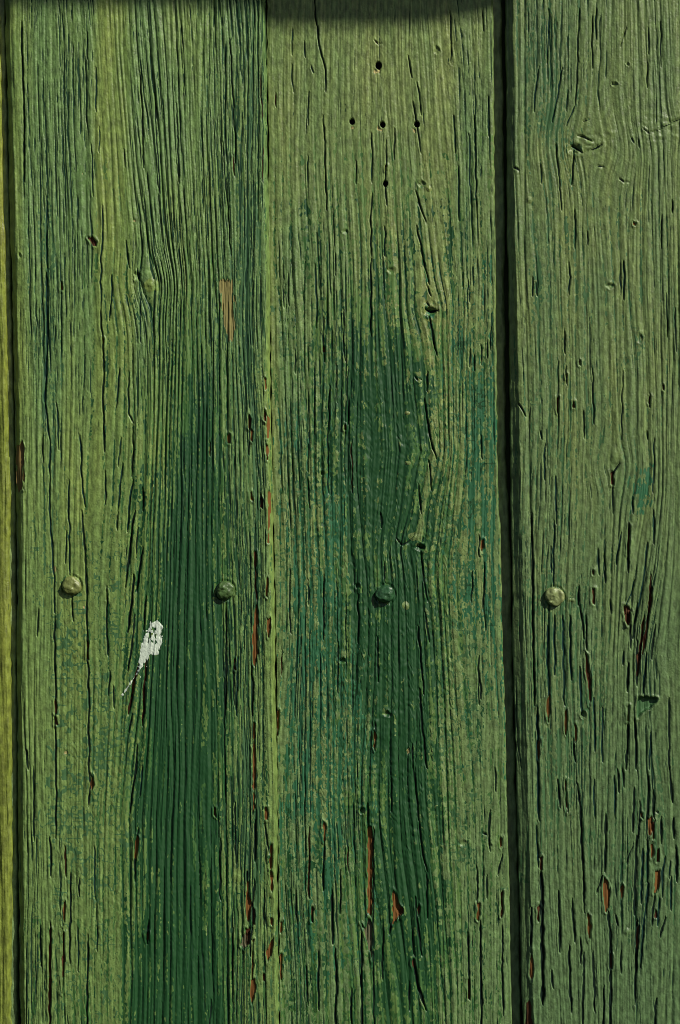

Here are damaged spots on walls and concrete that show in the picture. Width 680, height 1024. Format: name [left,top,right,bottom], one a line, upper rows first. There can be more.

peeling [219,279,236,342]
crack [8,0,410,1024]
crack [394,0,680,1024]
peeling [252,605,271,666]
peeling [624,588,652,638]
peeling [641,813,660,893]
peeling [362,826,373,957]
peeling [392,891,403,924]
peeling [603,878,624,912]